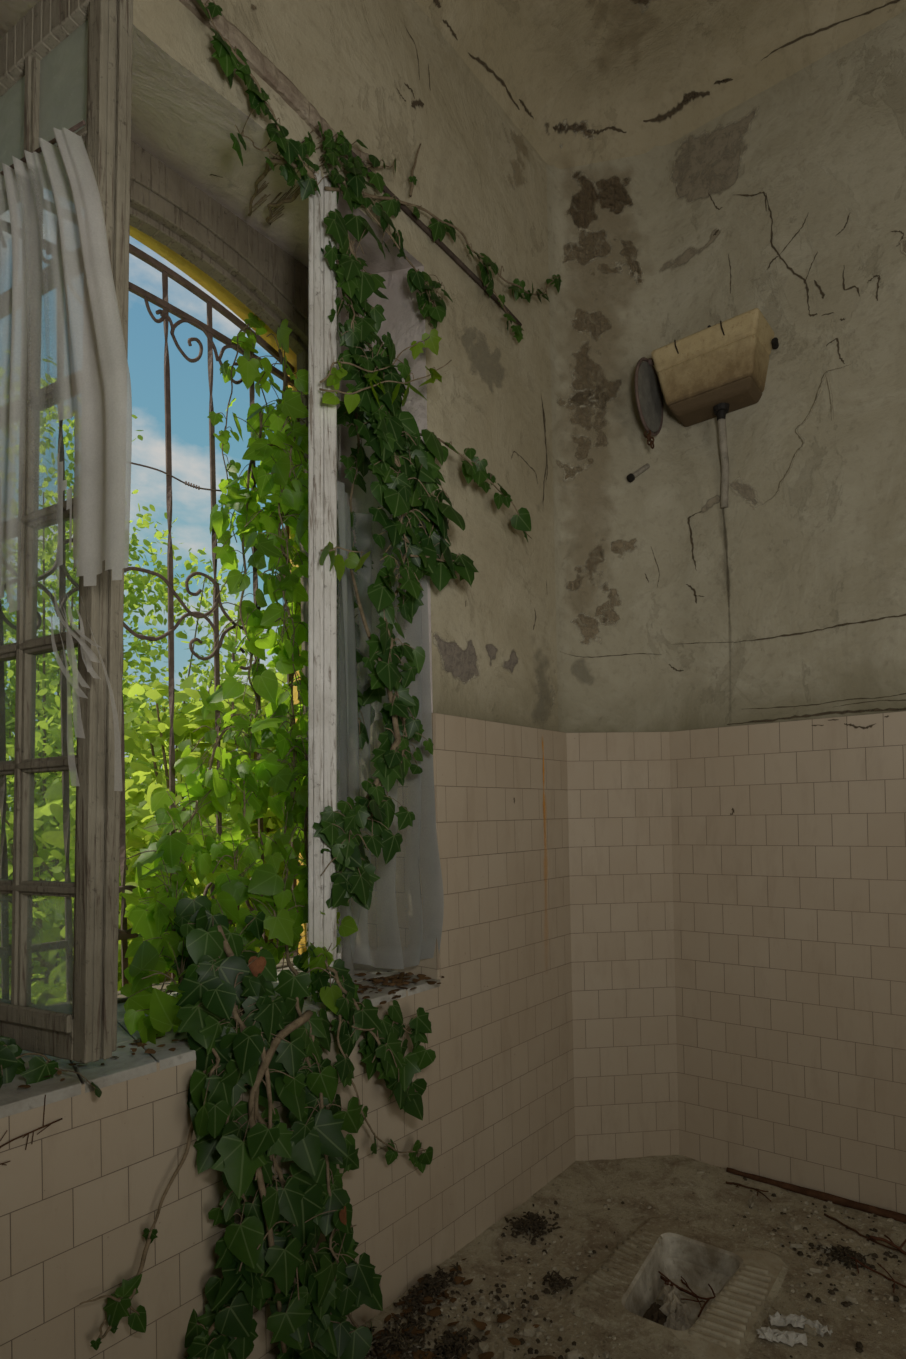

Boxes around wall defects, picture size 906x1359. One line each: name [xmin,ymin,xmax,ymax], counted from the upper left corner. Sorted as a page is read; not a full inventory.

crack [397,27,431,109]
crack [433,0,733,134]
crack [761,0,900,61]
spalling [564,172,644,284]
peeling [661,230,720,271]
crack [708,192,880,364]
peeling [433,633,518,683]
crack [562,614,906,658]